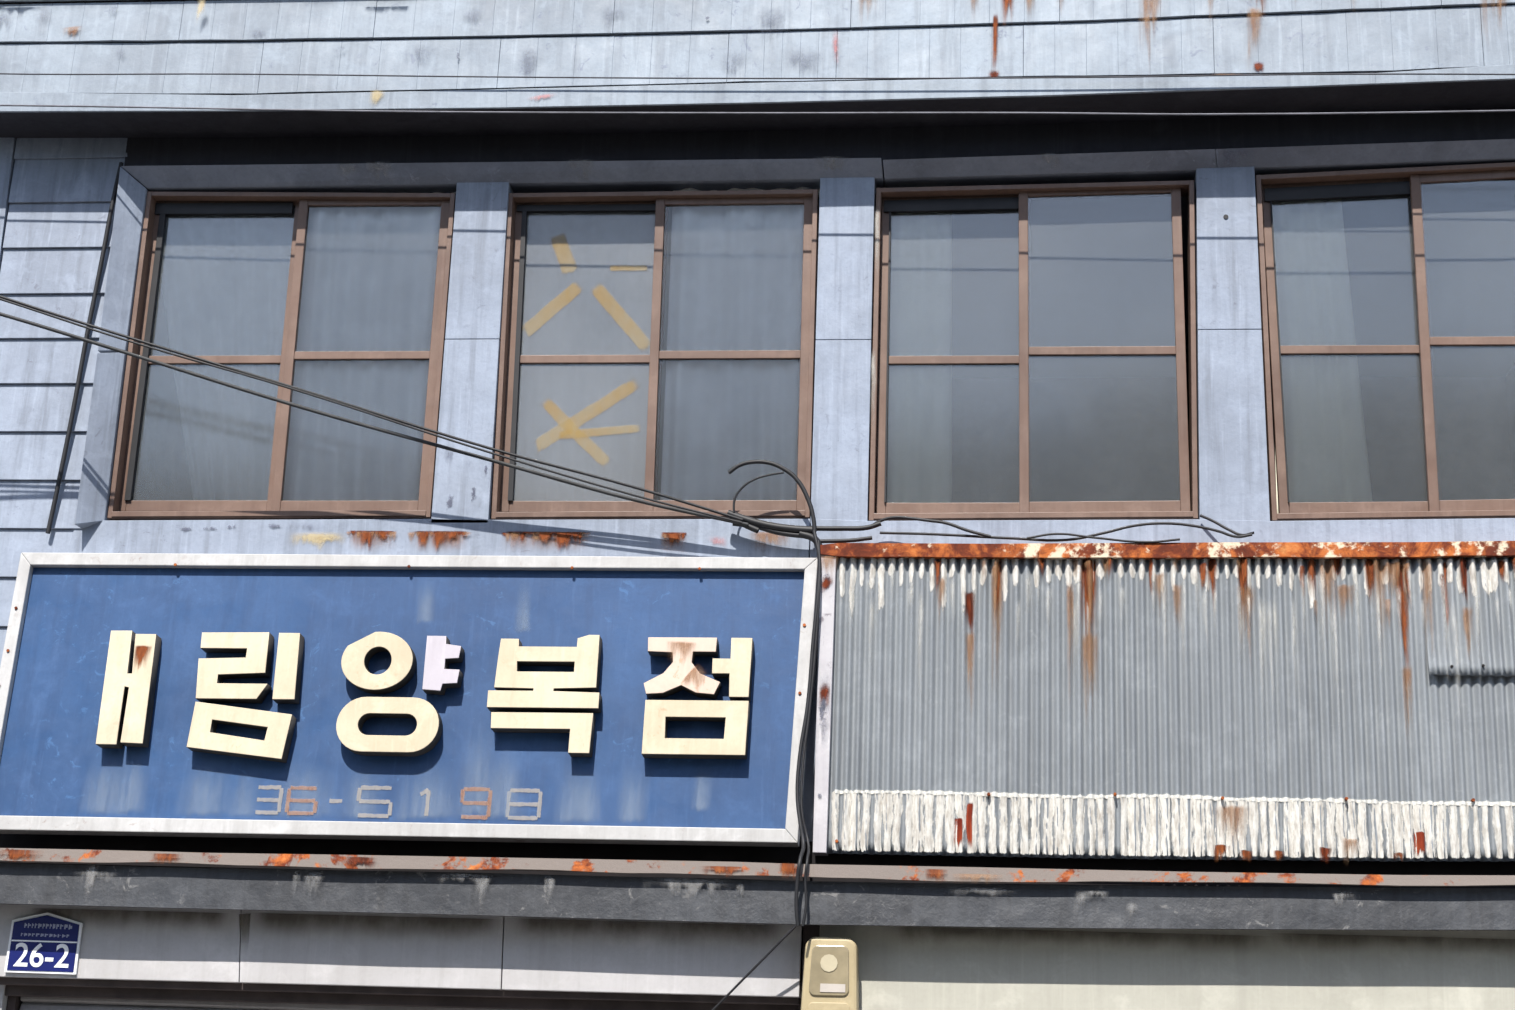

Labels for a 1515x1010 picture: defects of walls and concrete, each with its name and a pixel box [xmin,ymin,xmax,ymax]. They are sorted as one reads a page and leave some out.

rust [990,0,1031,77]
rust [347,531,470,547]
rust [502,532,588,546]
rust [1200,558,1217,592]
rust [1238,558,1251,613]
rust [1300,558,1349,598]
rust [966,592,975,673]
rust [1074,558,1112,672]
rust [1365,557,1470,697]
rust [954,803,973,847]
rust [1320,839,1357,859]
rust [1395,832,1425,858]